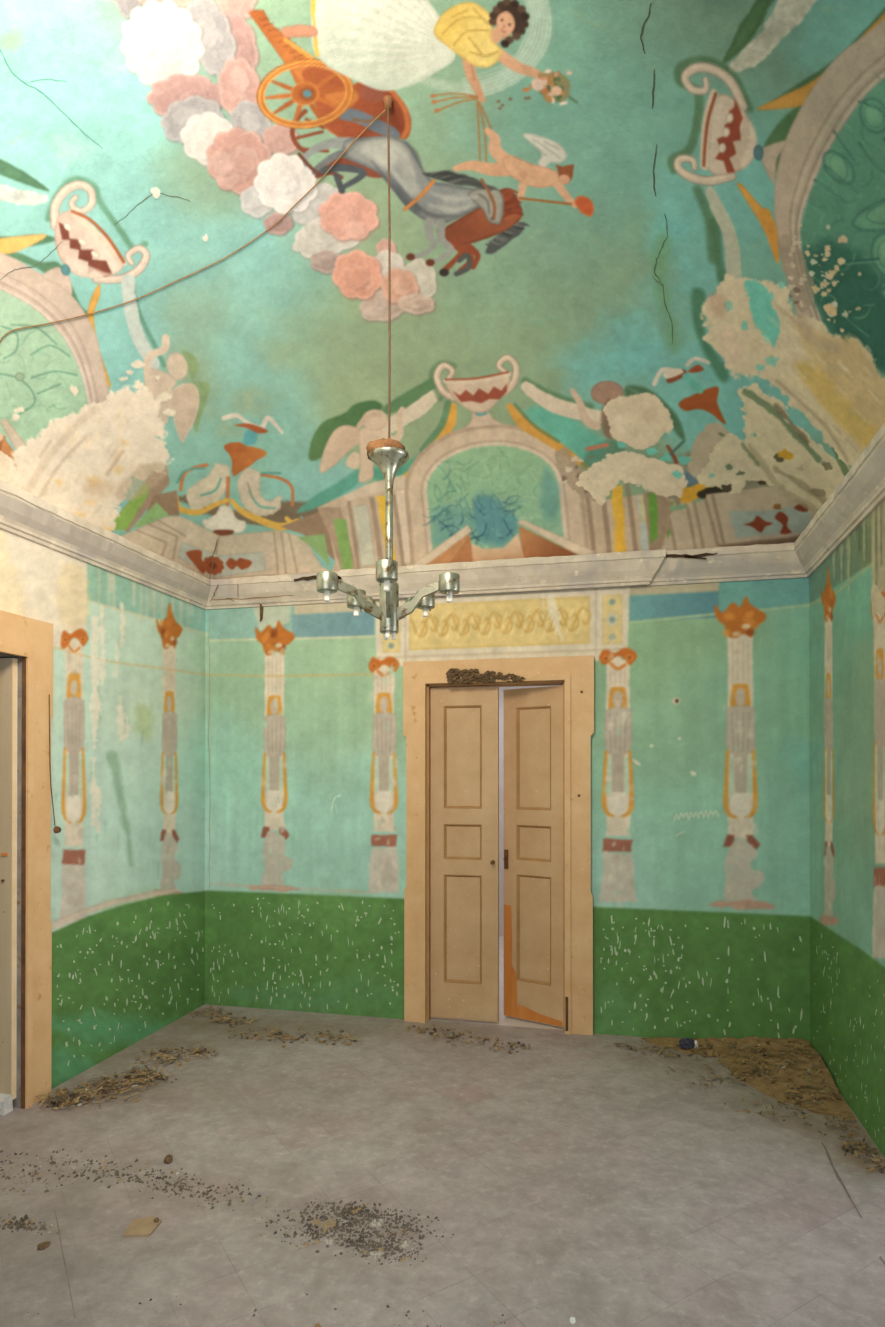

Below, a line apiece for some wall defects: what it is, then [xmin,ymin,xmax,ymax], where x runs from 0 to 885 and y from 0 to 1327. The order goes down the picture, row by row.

crack [0,50,101,147]
crack [640,3,655,109]
crack [652,145,673,344]
flaking render [0,358,178,534]
flaking render [553,221,885,513]